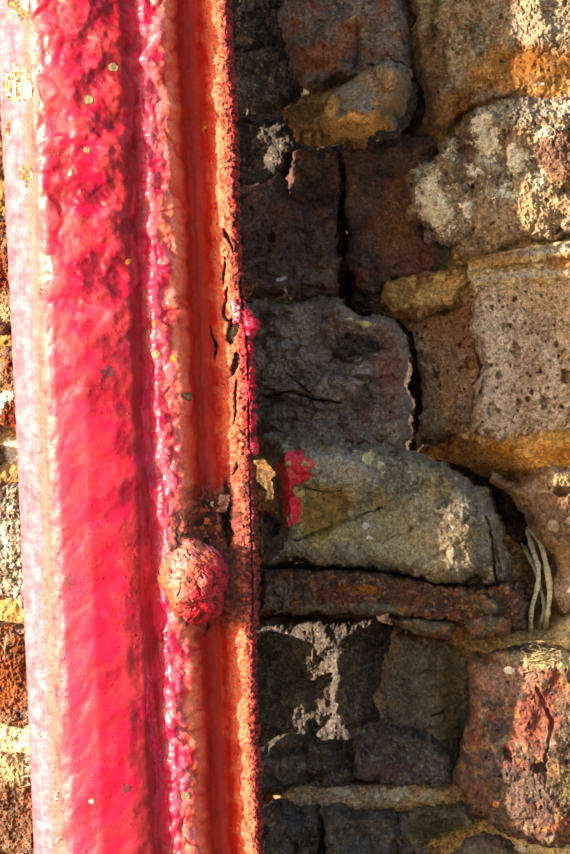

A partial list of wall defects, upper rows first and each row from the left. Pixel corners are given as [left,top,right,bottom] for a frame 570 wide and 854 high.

peeling [7,0,29,21]
peeling [4,62,33,103]
crack [210,229,341,447]
crack [334,152,423,451]
crack [218,464,445,619]
crack [435,459,528,583]